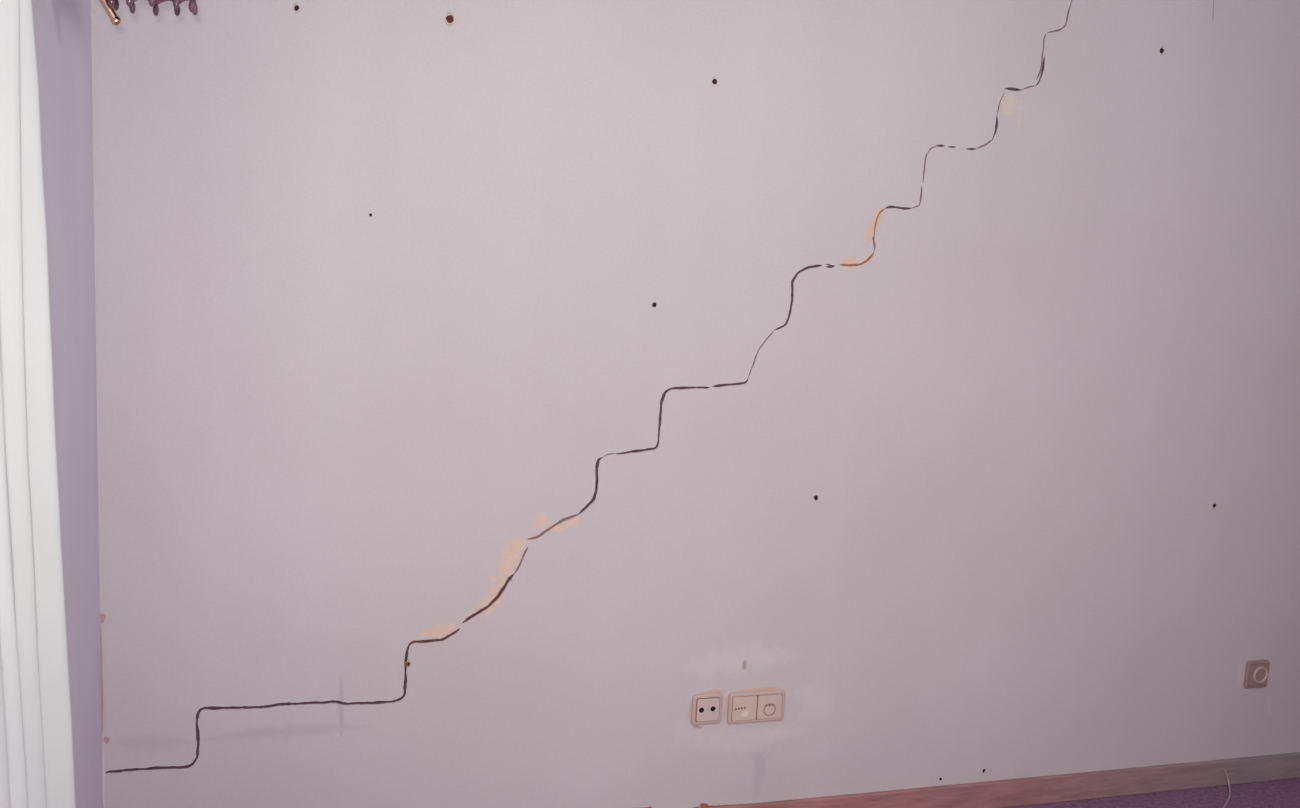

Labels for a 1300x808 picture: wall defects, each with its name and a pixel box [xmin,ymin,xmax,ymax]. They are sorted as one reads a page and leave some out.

spalling [417,511,583,639]
crack [105,0,1073,773]